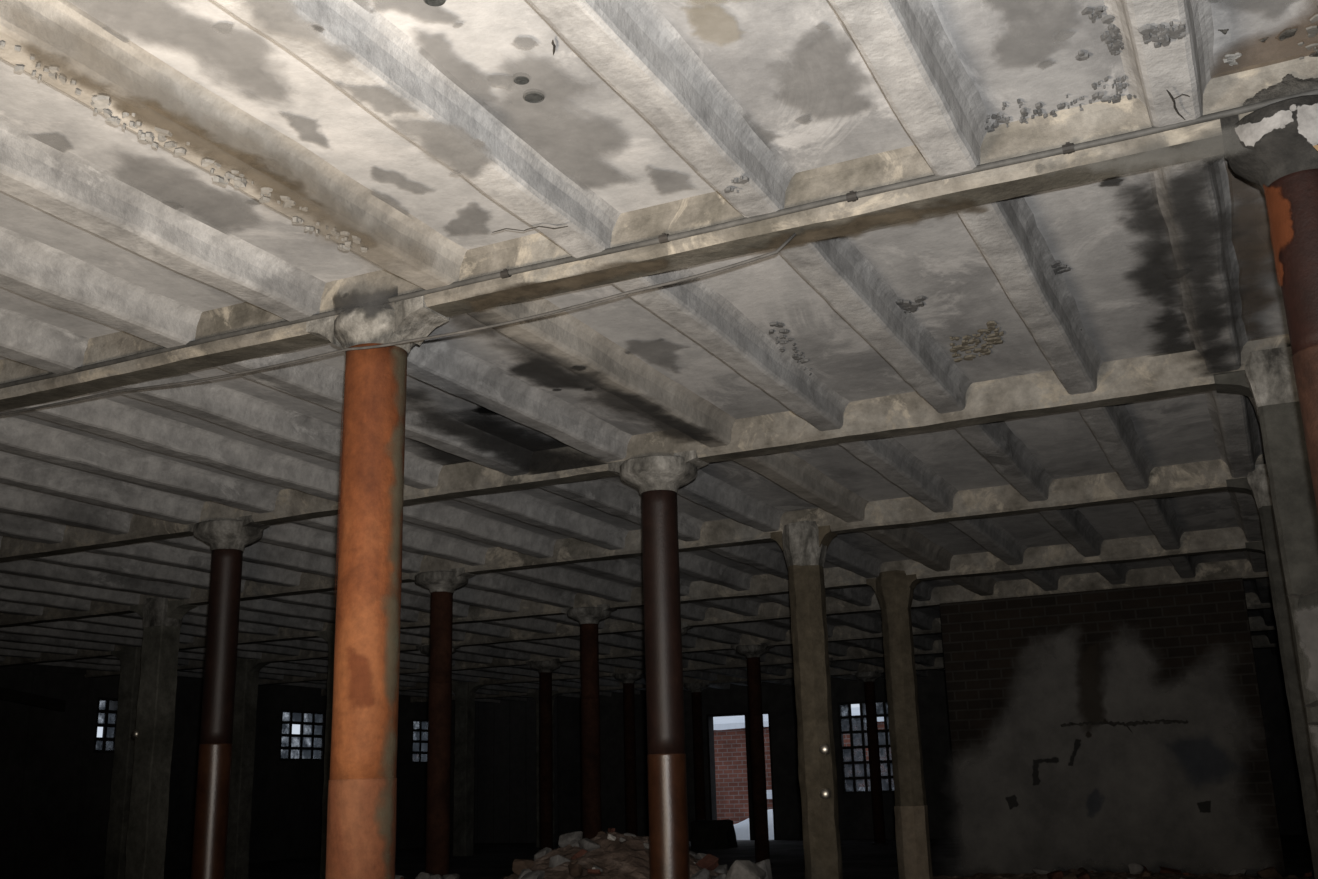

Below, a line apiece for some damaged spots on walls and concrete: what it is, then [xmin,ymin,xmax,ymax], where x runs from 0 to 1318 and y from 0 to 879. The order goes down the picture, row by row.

leakage [35,134,71,152]
leakage [67,0,353,147]
leakage [336,0,626,187]
leakage [688,0,739,44]
leakage [751,128,772,146]
leakage [782,24,870,124]
leakage [987,0,1124,68]
peeling [1222,53,1242,66]
peeling [1235,74,1318,151]
peeling [1259,5,1318,60]
leakage [120,157,261,233]
leakage [650,170,691,194]